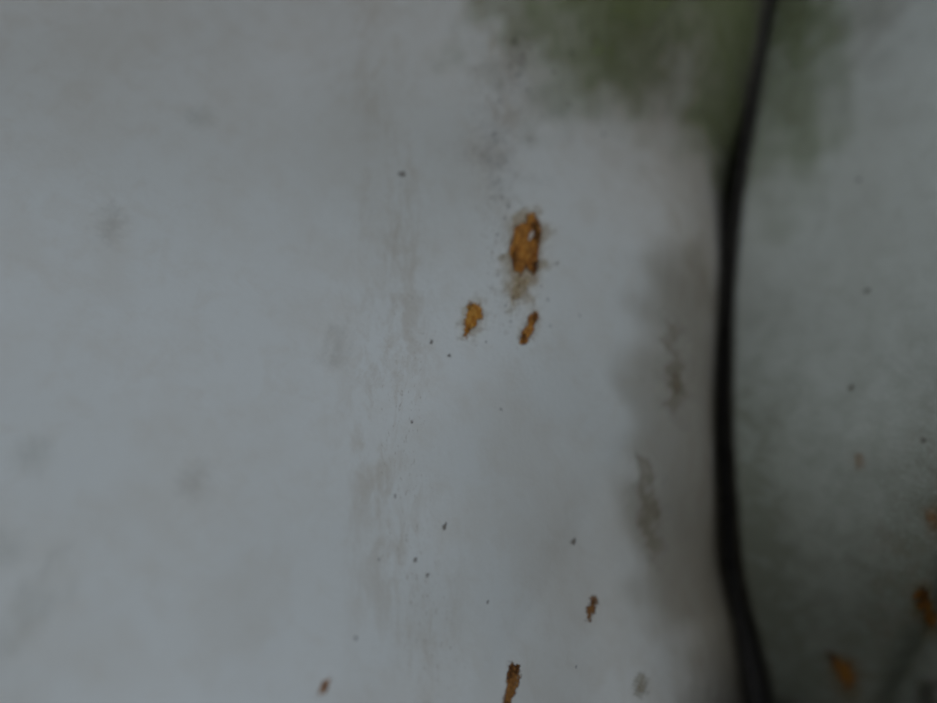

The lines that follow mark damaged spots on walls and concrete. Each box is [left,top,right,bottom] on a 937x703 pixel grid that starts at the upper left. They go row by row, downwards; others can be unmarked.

corrosion [509,212,542,276]
corrosion [464,301,483,336]
corrosion [519,311,539,345]
corrosion [586,596,599,622]
corrosion [503,662,520,703]